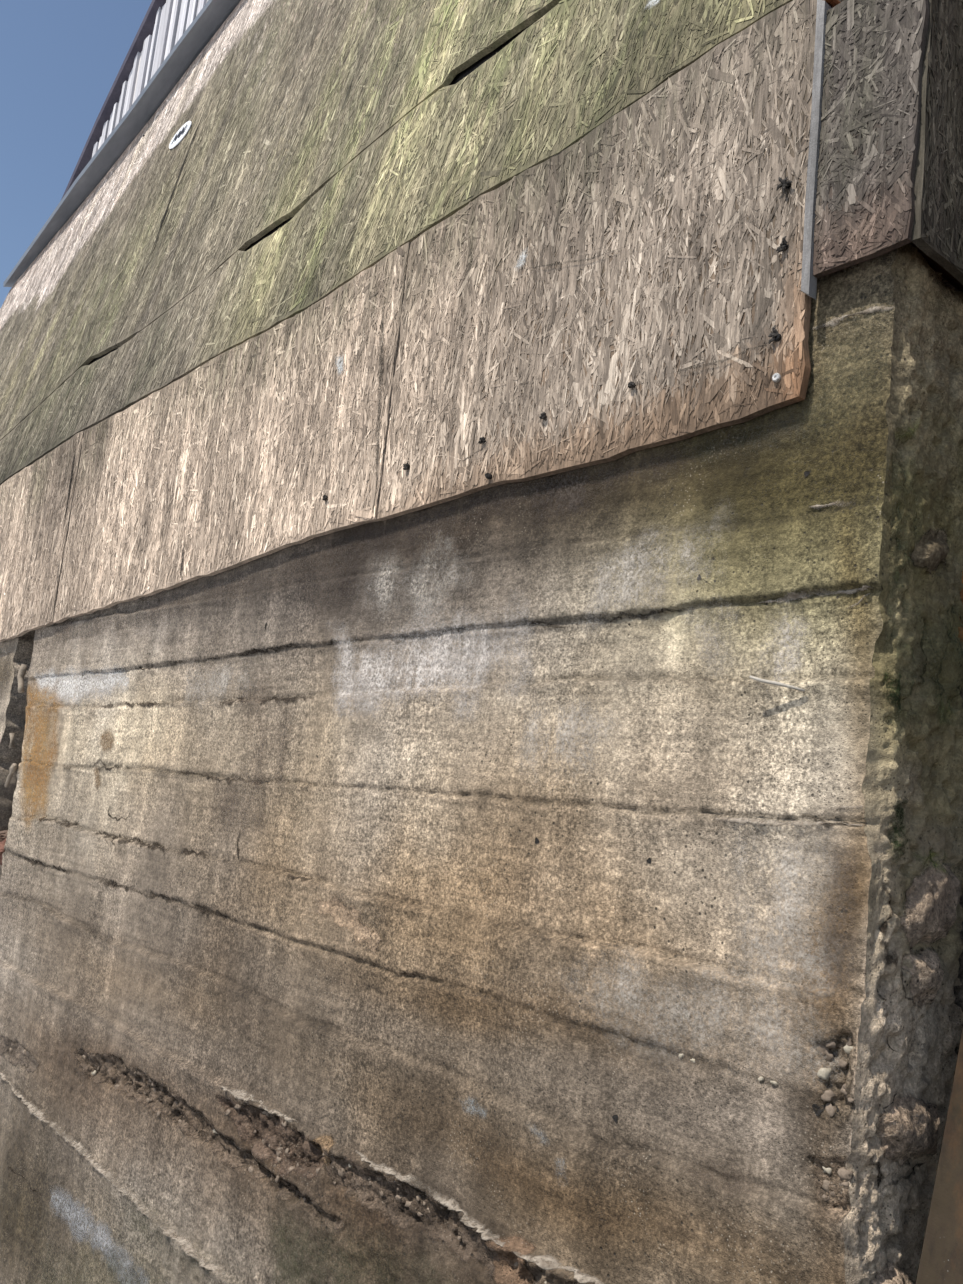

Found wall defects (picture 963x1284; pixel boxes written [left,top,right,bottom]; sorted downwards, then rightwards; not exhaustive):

leakage [592,549,663,617]
rust [22,687,60,825]
spalling [0,1035,38,1072]
spalling [811,1035,855,1125]
spalling [74,1049,498,1276]
spalling [810,1156,854,1221]
spalling [514,1261,577,1284]